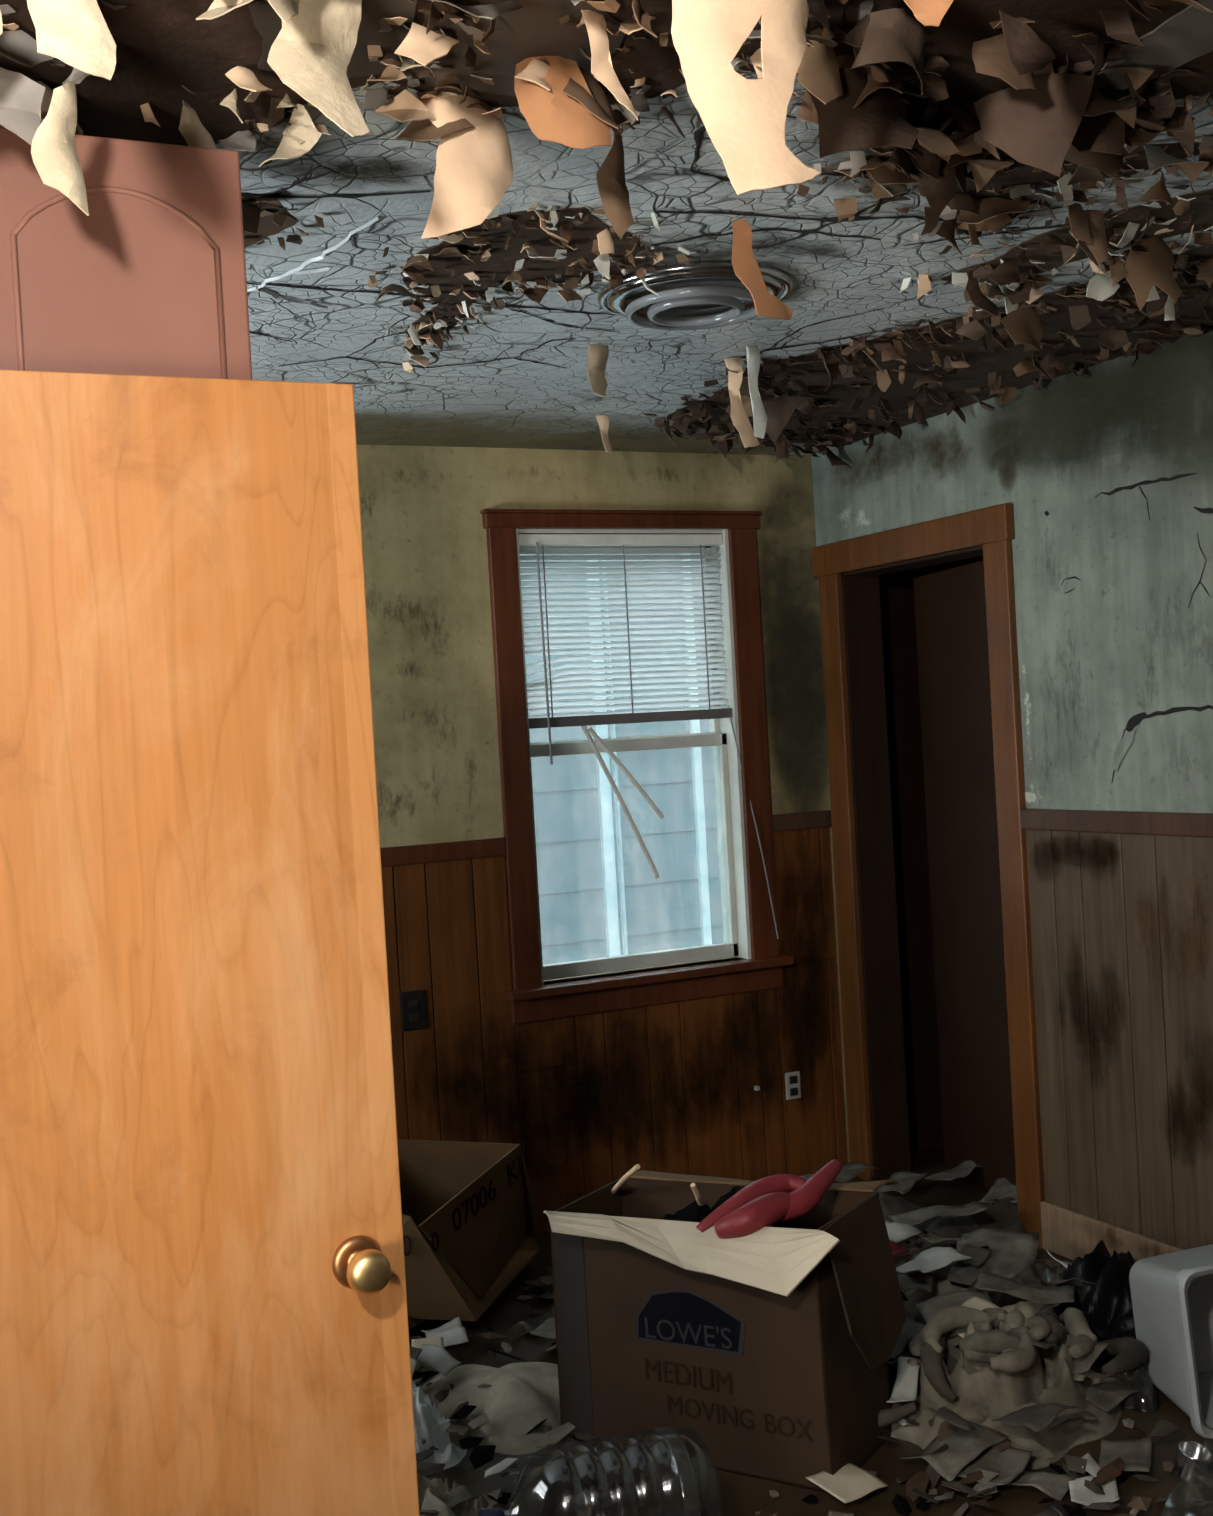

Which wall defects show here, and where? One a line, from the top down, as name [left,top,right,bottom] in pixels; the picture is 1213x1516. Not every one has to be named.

crack [241,172,620,368]
peeling [0,0,1213,468]
crack [710,308,884,366]
crack [649,126,1142,249]
crack [1094,473,1213,608]
crack [1112,705,1213,782]